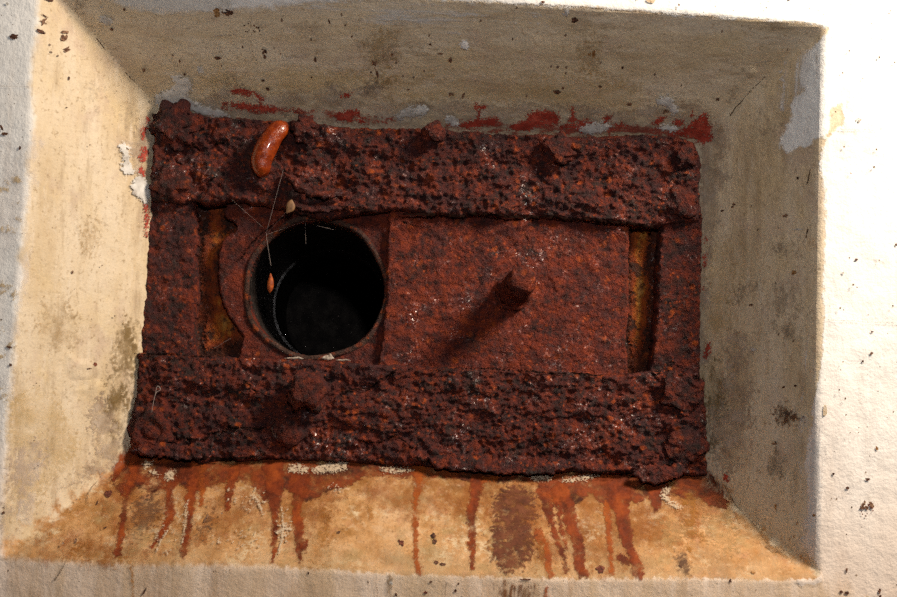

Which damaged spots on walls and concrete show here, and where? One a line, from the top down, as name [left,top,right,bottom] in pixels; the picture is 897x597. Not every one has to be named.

peeling [118,60,736,269]
mould [104,388,133,433]
mould [111,315,138,377]
rust [200,206,243,352]
rust [627,229,653,373]
mould [772,405,804,426]
rust [106,447,730,597]